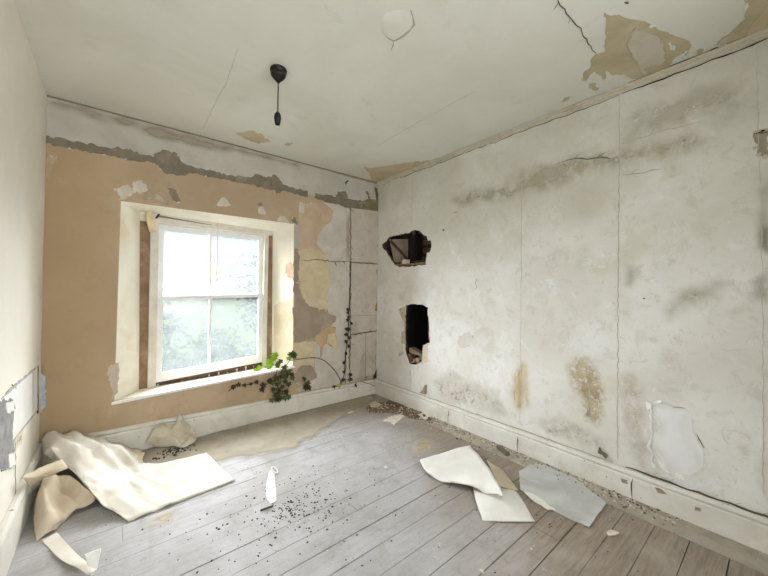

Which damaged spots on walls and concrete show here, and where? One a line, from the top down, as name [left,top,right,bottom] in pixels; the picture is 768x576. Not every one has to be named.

crack [554,0,596,53]
peeling [582,12,704,91]
peeling [237,130,270,144]
peeling [364,160,431,182]
peeling [46,135,378,384]
peeling [0,398,17,472]